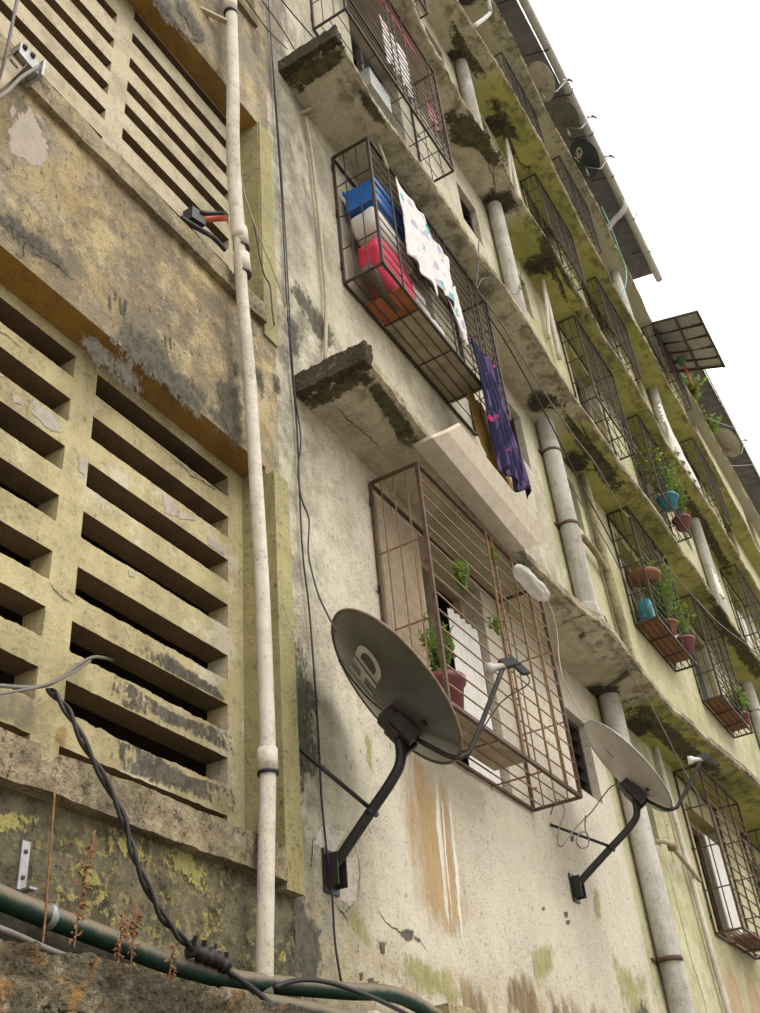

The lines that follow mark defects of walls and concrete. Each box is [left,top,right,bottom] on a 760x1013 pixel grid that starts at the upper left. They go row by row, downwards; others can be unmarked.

leakage [484,115,506,137]
leakage [435,783,463,937]
leakage [401,929,421,942]
leakage [462,978,487,1013]
leakage [509,975,539,1013]